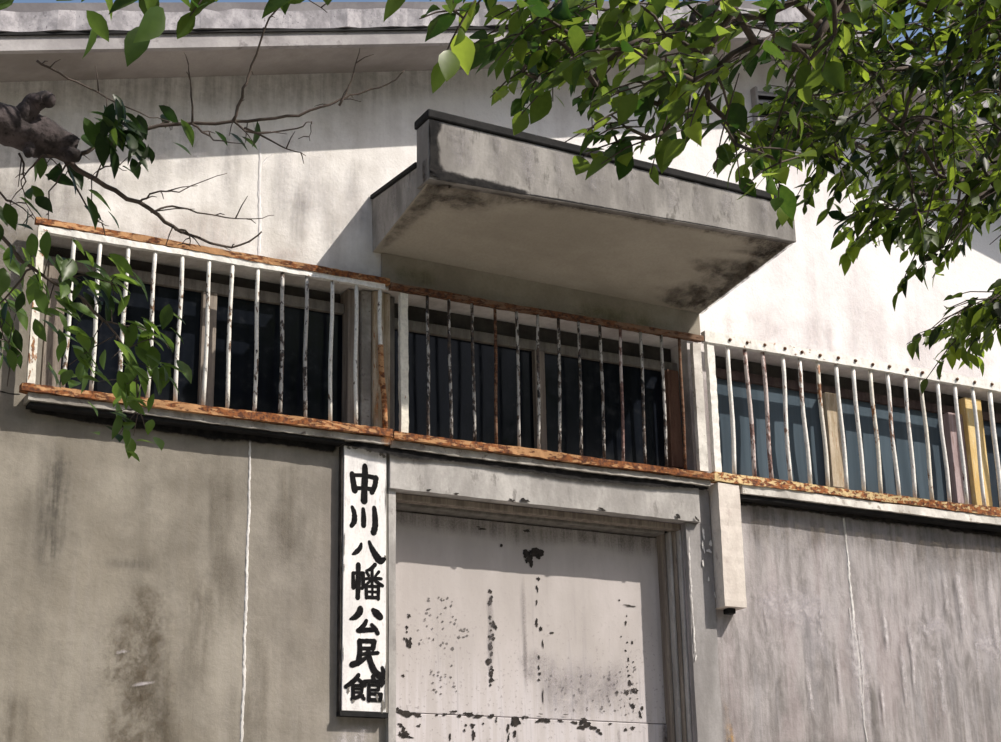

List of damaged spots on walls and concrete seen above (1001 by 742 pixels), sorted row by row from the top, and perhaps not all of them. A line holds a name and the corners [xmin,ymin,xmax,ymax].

leakage [404,119,787,307]
leakage [740,501,1001,538]
peeling [523,547,544,605]
peeling [403,597,469,650]
peeling [486,589,497,686]
peeling [376,665,422,738]
peeling [435,618,644,742]